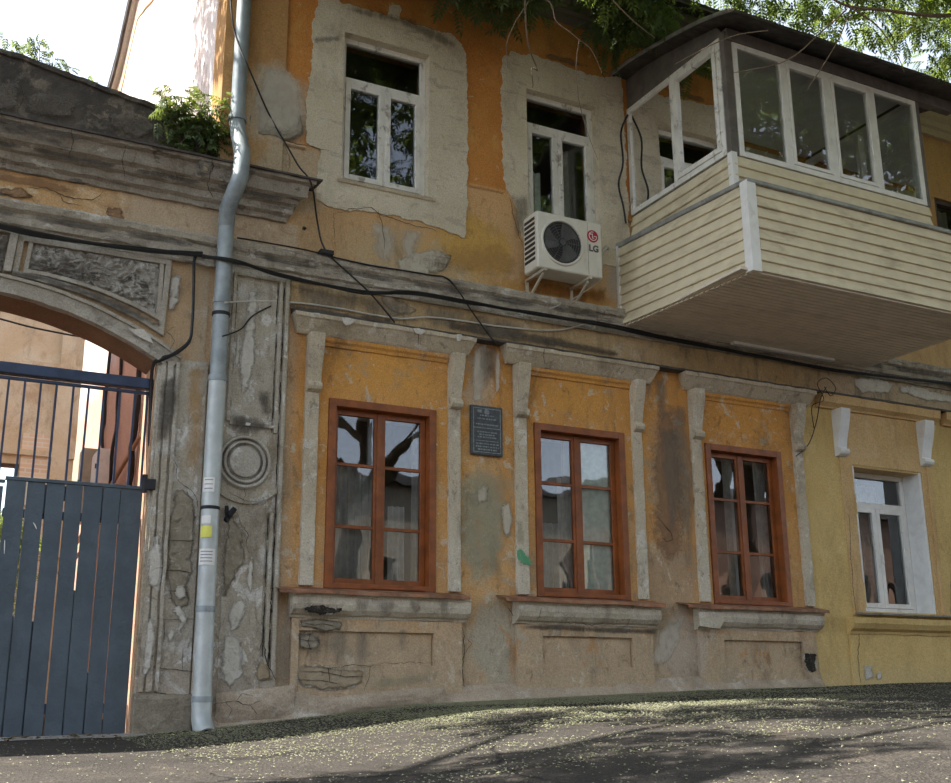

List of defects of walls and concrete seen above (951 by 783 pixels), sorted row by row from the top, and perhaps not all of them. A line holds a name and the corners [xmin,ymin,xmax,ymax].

flaking render [0,187,33,198]
flaking render [397,249,452,274]
flaking render [235,289,258,394]
flaking render [855,377,951,403]
leakage [653,412,685,559]
flaking render [142,619,155,677]
flaking render [147,489,196,642]
flaking render [220,515,272,686]